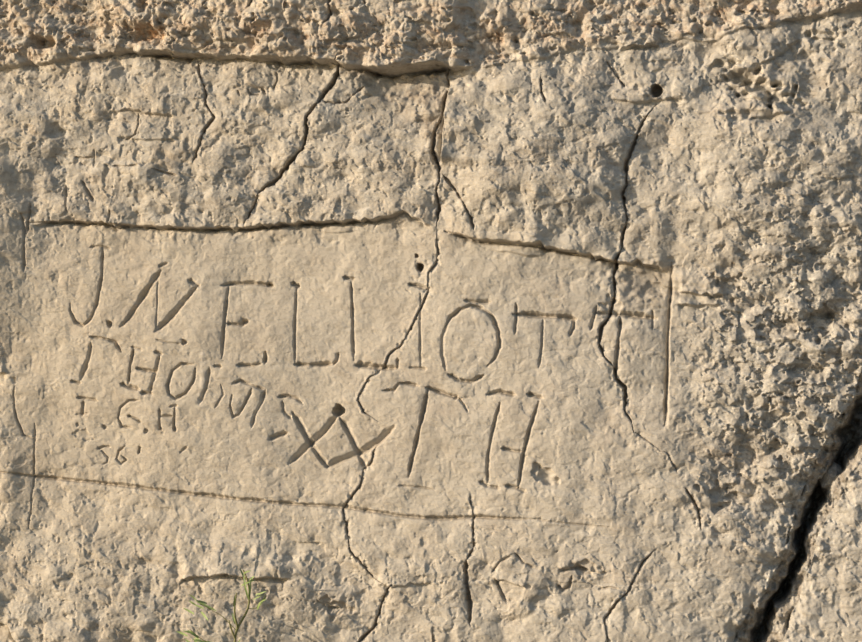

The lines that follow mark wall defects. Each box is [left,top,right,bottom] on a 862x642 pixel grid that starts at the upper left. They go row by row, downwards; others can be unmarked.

crack [192,60,216,165]
crack [243,55,368,225]
crack [356,65,476,423]
crack [597,104,703,532]
crack [341,444,394,642]
crack [462,495,476,628]
crack [603,549,656,642]
crack [735,376,862,642]